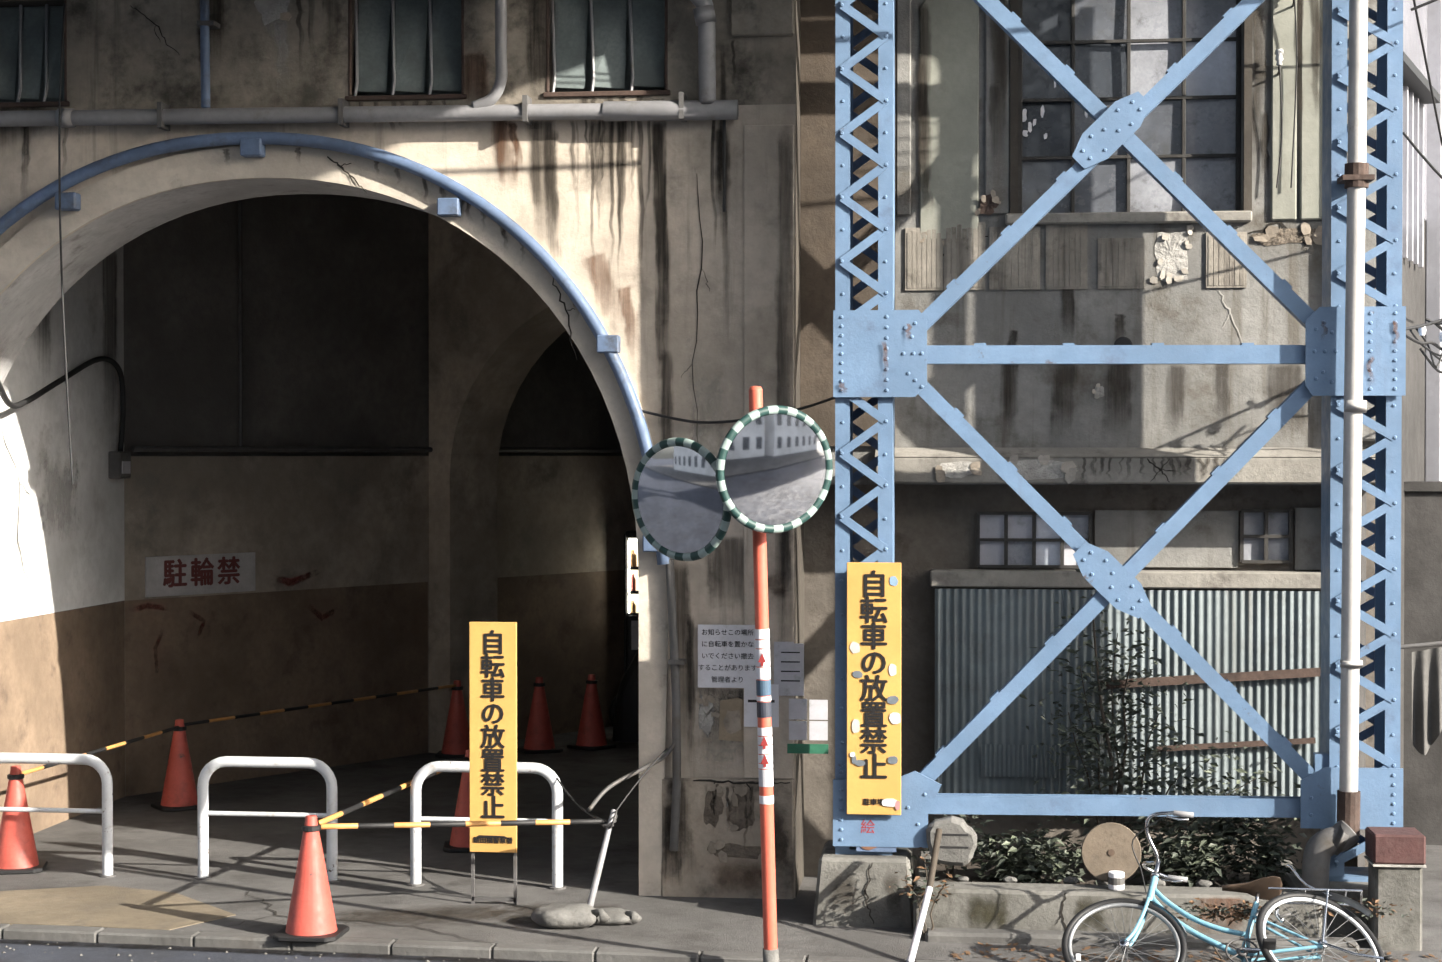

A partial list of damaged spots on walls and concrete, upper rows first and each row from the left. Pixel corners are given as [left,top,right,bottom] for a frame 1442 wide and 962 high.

leakage [528,0,555,78]
leakage [530,121,669,310]
peeling [1150,225,1194,284]
leakage [1062,289,1075,324]
leakage [661,354,671,440]
leakage [1004,364,1018,416]
leakage [1051,364,1075,418]
leakage [1108,364,1131,413]
leakage [1171,367,1184,413]
leakage [1217,364,1228,407]